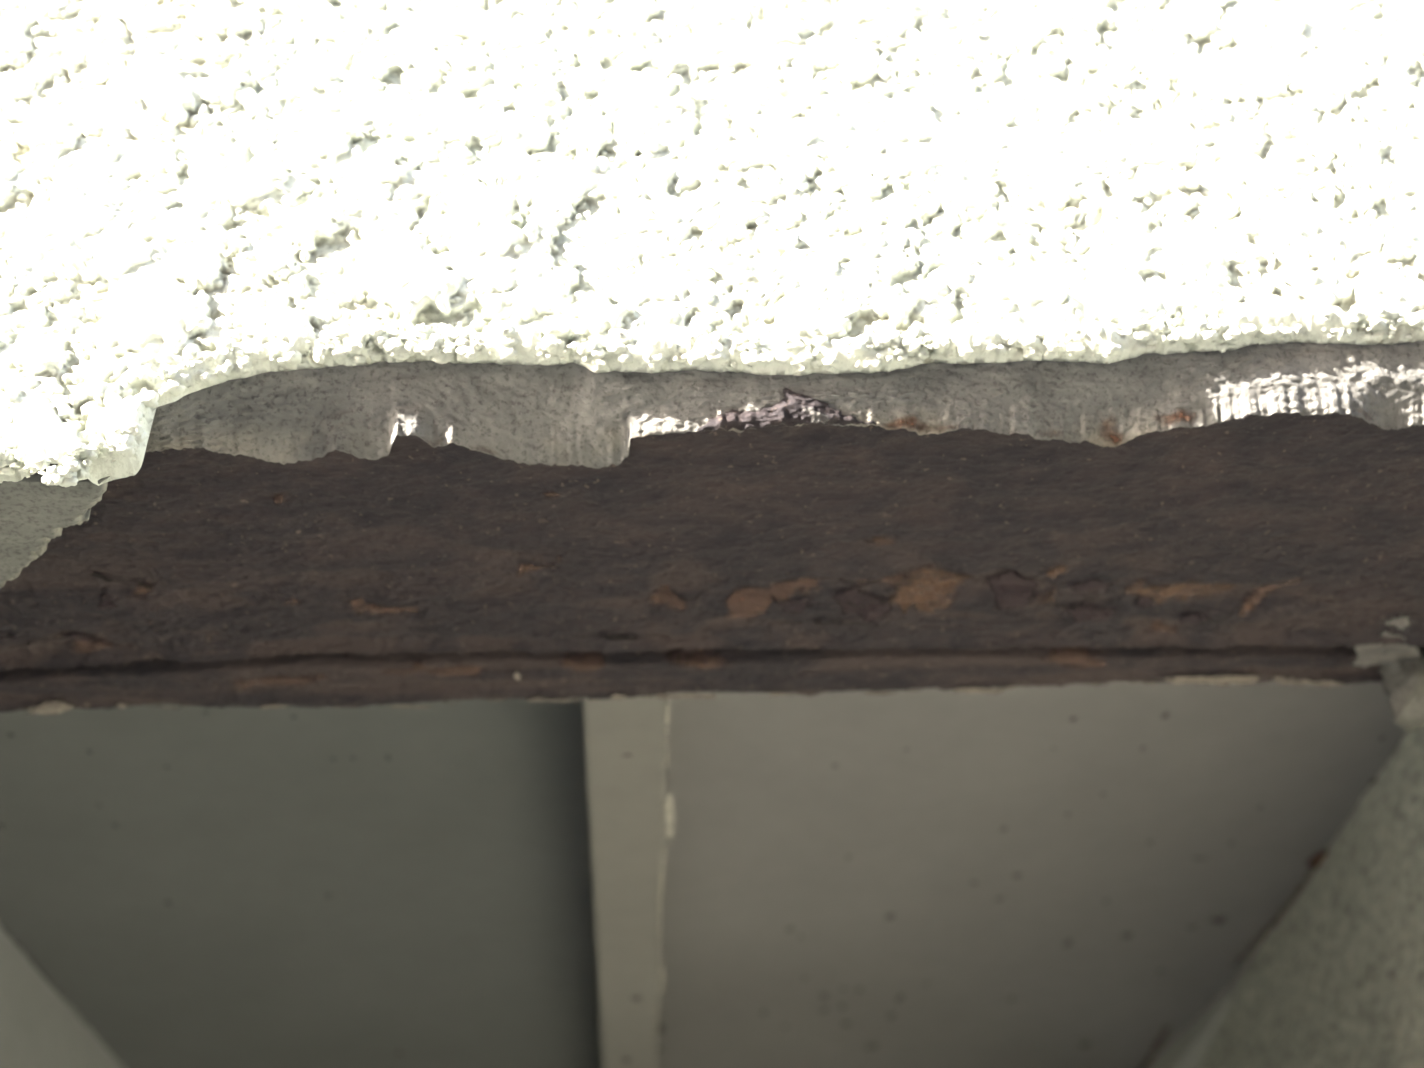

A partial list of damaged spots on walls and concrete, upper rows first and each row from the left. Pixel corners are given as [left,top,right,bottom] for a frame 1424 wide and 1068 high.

flaking render [145,340,1424,469]
rust [726,577,819,618]
rust [840,567,971,614]
rust [1125,579,1234,634]
peeling [1352,615,1422,668]
peeling [25,700,76,715]
peeling [954,685,1016,695]
peeling [1132,675,1344,688]
peeling [657,793,675,941]